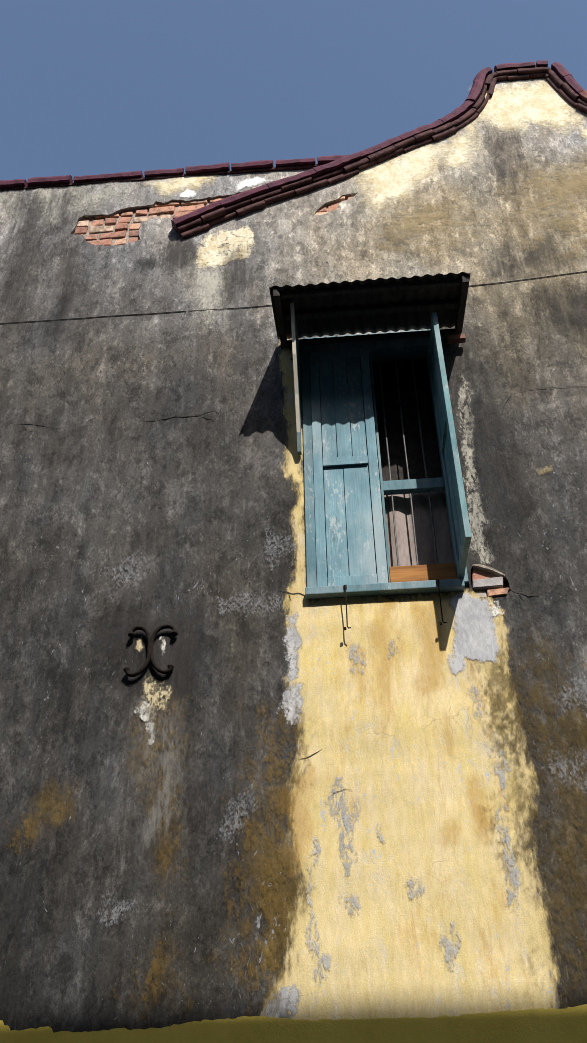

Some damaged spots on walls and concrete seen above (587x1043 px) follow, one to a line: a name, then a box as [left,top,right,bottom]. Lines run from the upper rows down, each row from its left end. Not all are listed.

flaking render [73,197,227,246]
flaking render [315,195,355,215]
leakage [136,620,197,690]
peeling [278,612,304,725]
peeling [448,564,509,674]
flaking render [134,681,179,837]
peeling [325,775,359,876]
peeling [261,984,299,1019]